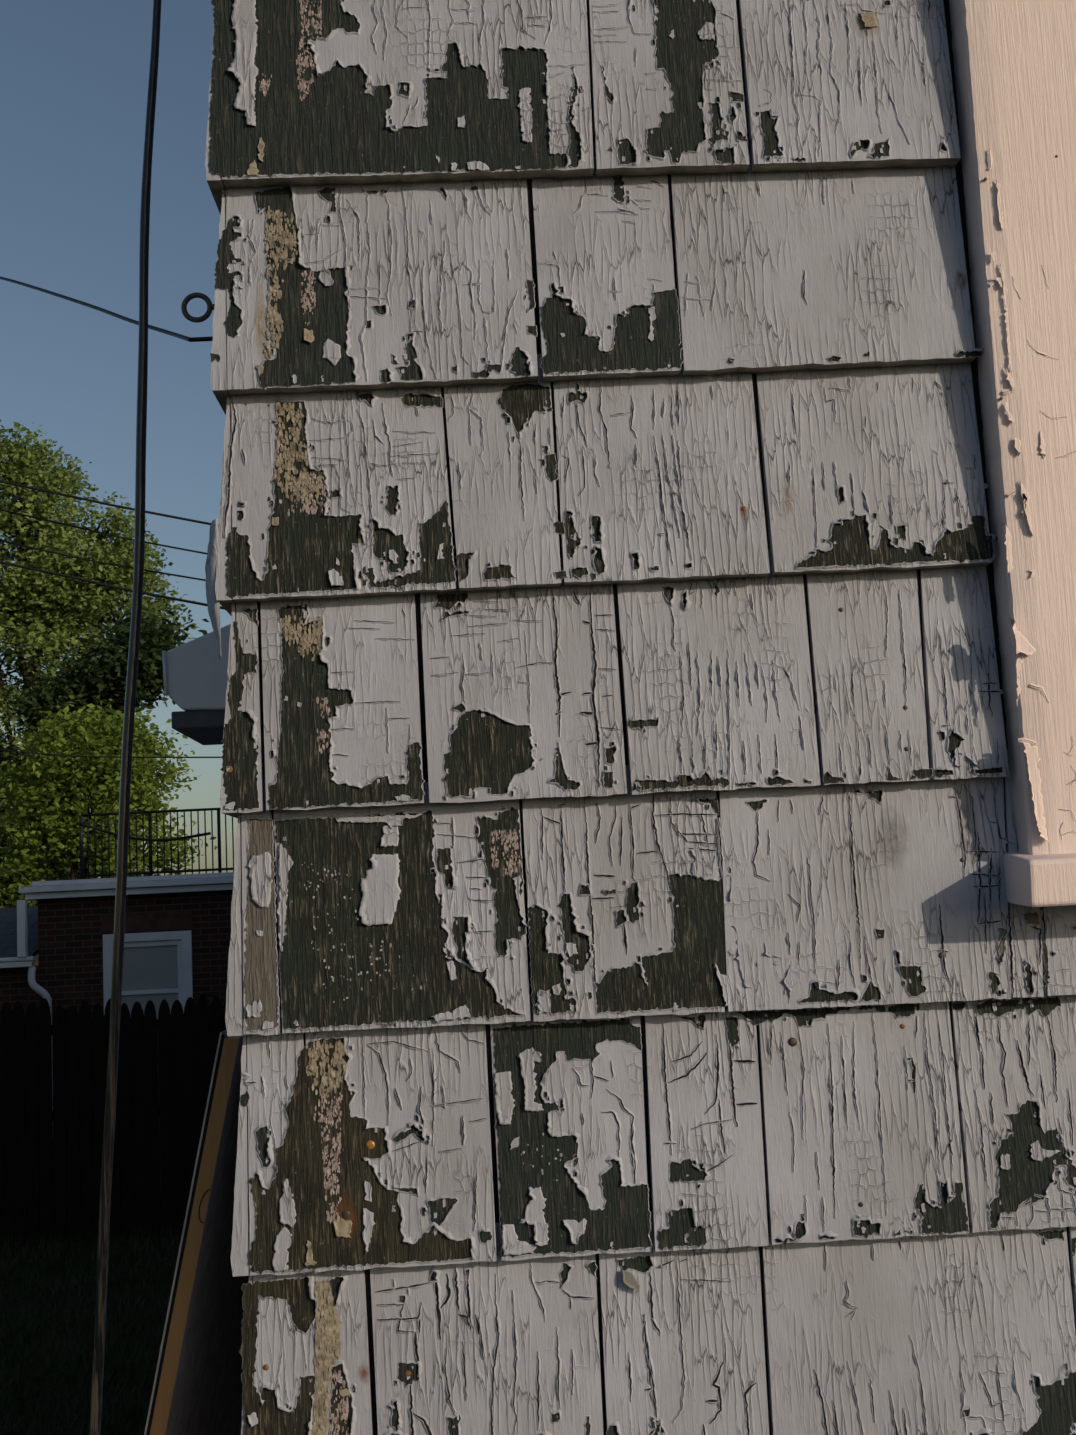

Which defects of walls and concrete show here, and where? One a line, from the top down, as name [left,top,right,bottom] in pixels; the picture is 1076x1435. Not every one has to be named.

crack [704,0,956,205]
peeling [953,348,984,358]
peeling [991,251,1021,456]
peeling [793,481,1035,578]
peeling [1010,618,1036,709]
peeling [205,0,928,1435]
peeling [600,727,1004,816]
peeling [774,1178,969,1244]
peeling [986,1098,1076,1230]
crack [813,1335,1025,1435]
peeling [960,1404,992,1435]
peeling [1017,1363,1076,1435]